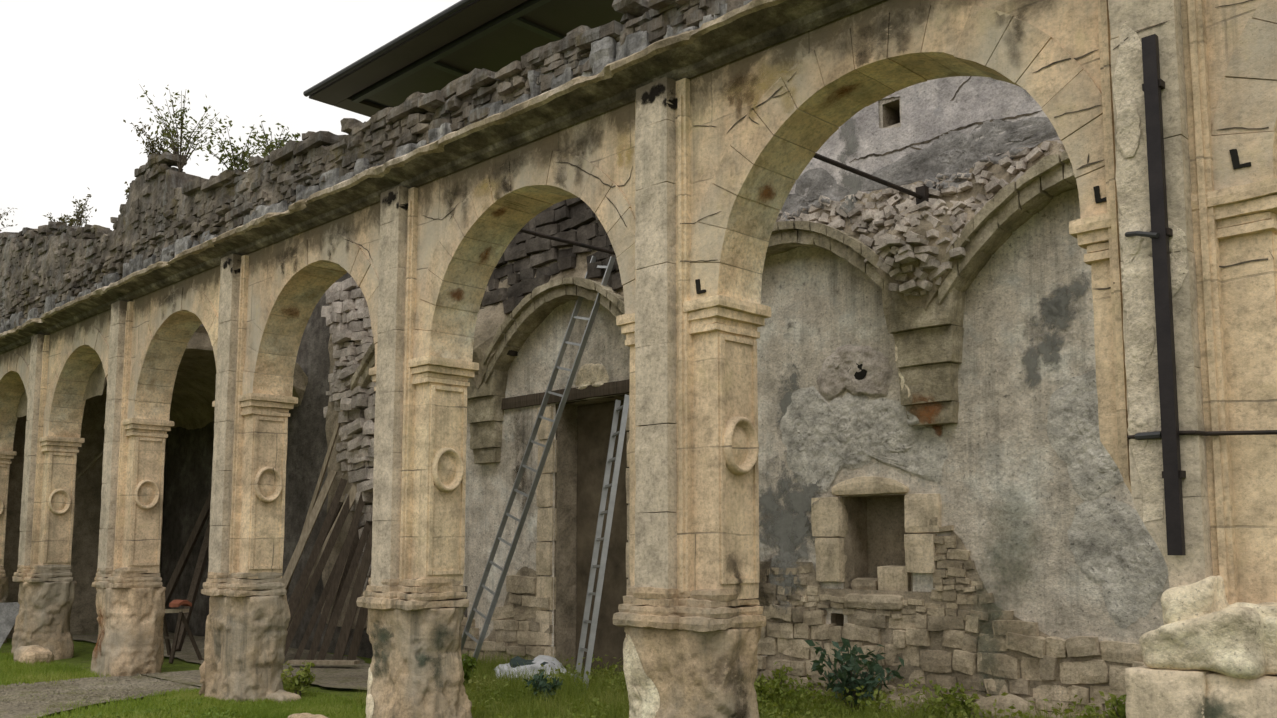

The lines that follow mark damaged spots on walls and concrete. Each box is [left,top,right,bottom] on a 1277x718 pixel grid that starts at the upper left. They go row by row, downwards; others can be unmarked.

crack [1033,21,1168,73]
crack [695,71,797,133]
crack [849,76,1100,163]
crack [556,162,633,227]
flaking render [778,117,1058,221]
crack [1076,154,1103,170]
damp [1022,274,1090,388]
flaking render [780,344,948,493]
damp [372,625,391,676]